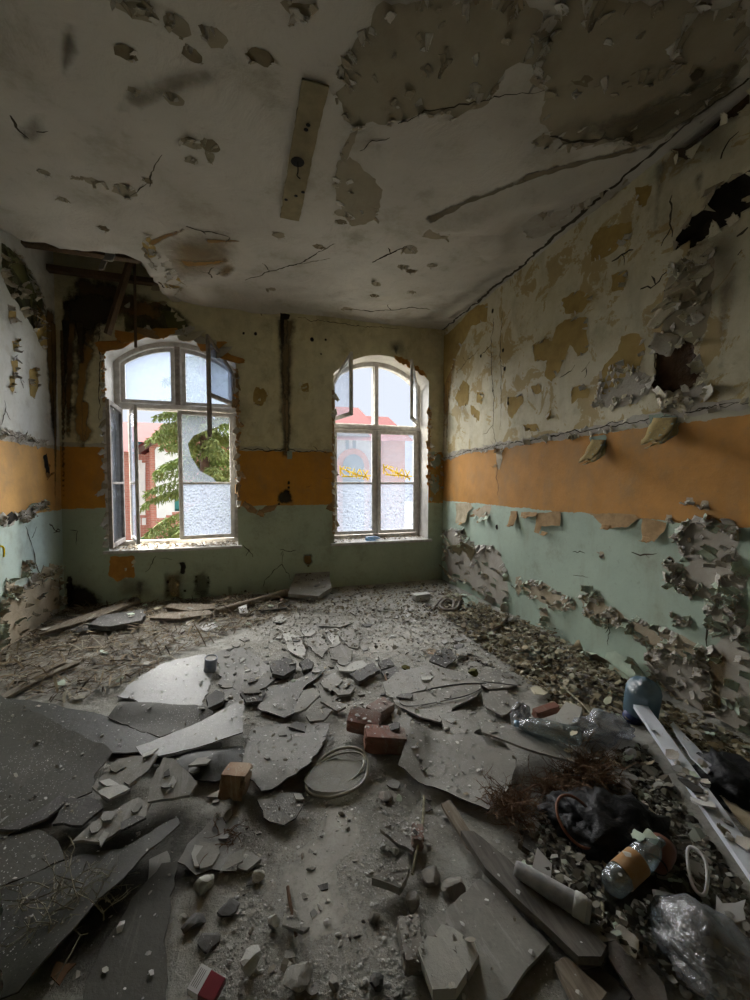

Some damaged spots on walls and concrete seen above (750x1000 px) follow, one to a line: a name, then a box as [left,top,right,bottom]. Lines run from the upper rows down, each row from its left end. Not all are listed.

peeling [109,0,228,65]
peeling [245,47,278,67]
peeling [332,0,750,226]
peeling [9,338,42,399]
spalling [1,243,51,350]
crack [246,244,333,280]
crack [298,78,750,495]
spalling [422,170,750,503]
peeling [0,427,55,480]
peeling [0,499,51,527]
peeling [0,560,68,652]
peeling [438,497,750,737]